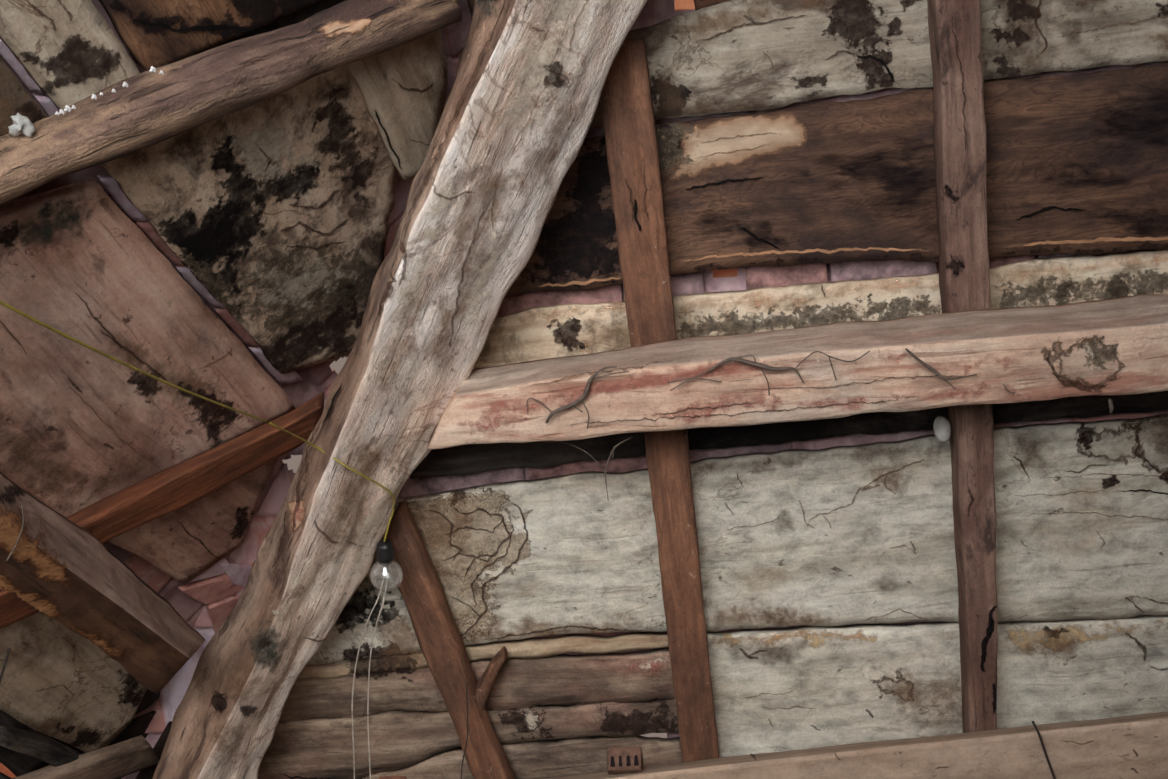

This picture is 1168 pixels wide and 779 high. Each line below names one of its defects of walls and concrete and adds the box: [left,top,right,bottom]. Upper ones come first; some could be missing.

leakage [109,0,316,40]
leakage [695,0,922,91]
leakage [991,0,1048,77]
leakage [1064,3,1168,39]
leakage [649,62,763,190]
leakage [826,143,936,211]
leakage [155,87,378,372]
leakage [702,217,783,249]
leakage [678,283,941,339]
leakage [994,258,1168,308]
crack [1014,456,1168,520]